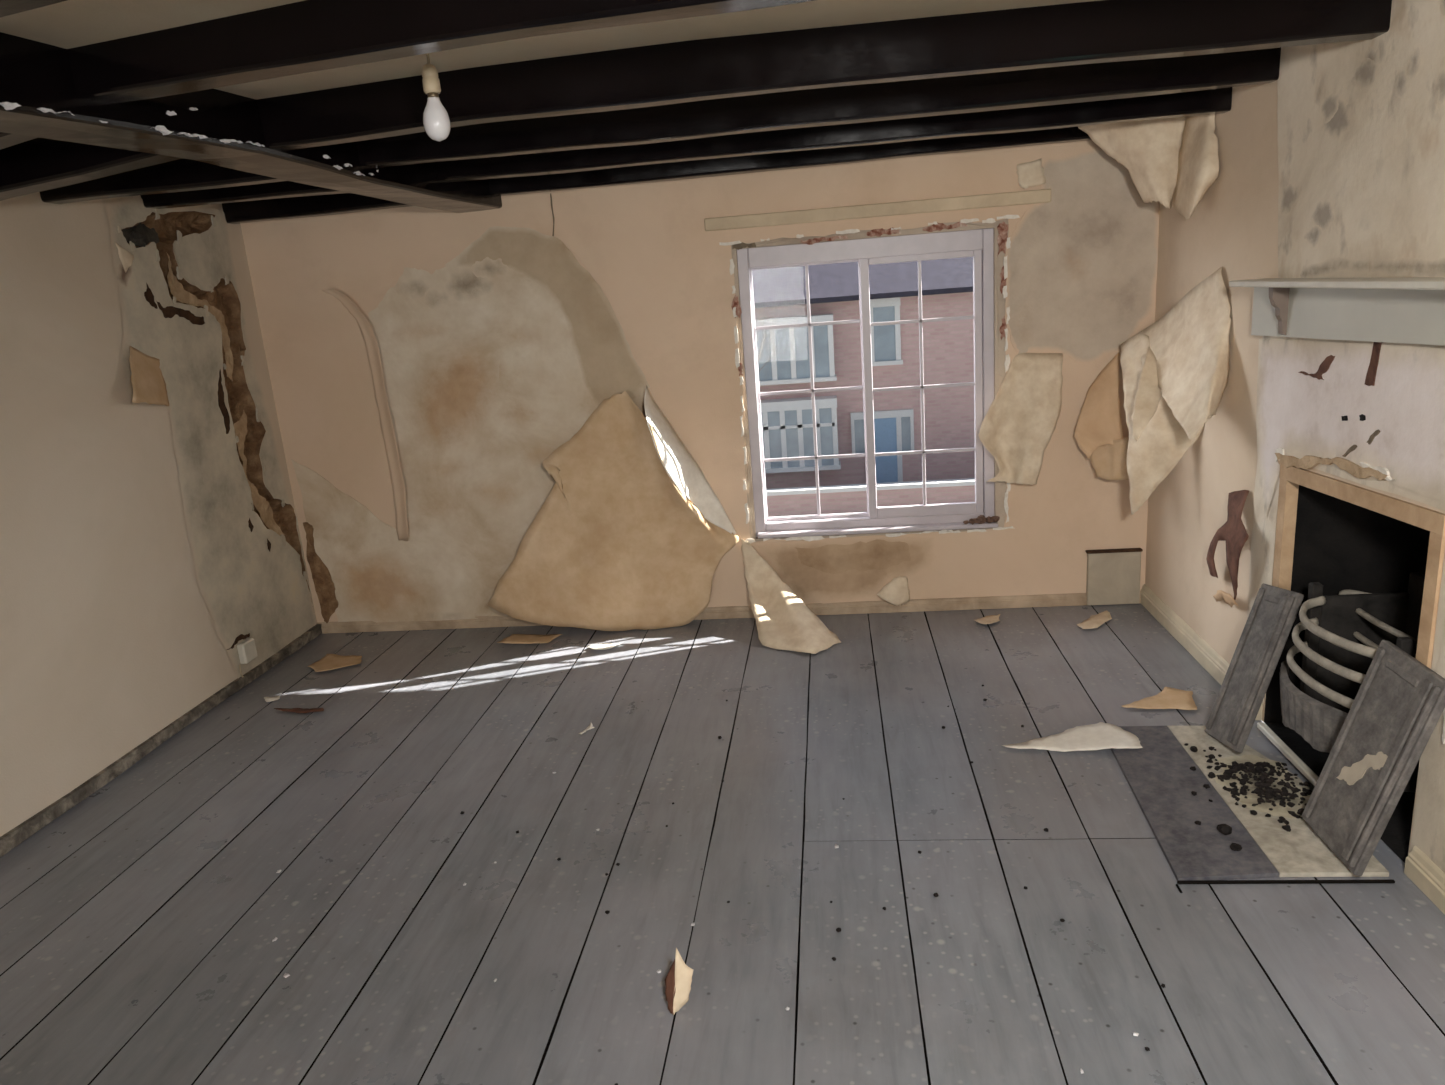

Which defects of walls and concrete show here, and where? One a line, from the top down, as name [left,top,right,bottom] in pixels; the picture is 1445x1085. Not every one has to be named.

mould [1321,93,1351,139]
peeling [1277,0,1445,278]
water stain [1298,199,1445,278]
crack [118,209,338,623]
peeling [104,198,650,678]
water stain [328,547,479,623]
water stain [387,257,556,521]
water stain [796,539,911,574]
peeling [719,148,1159,604]
peeling [1247,336,1445,619]
peeling [1410,712,1445,873]
crack [1437,708,1445,744]